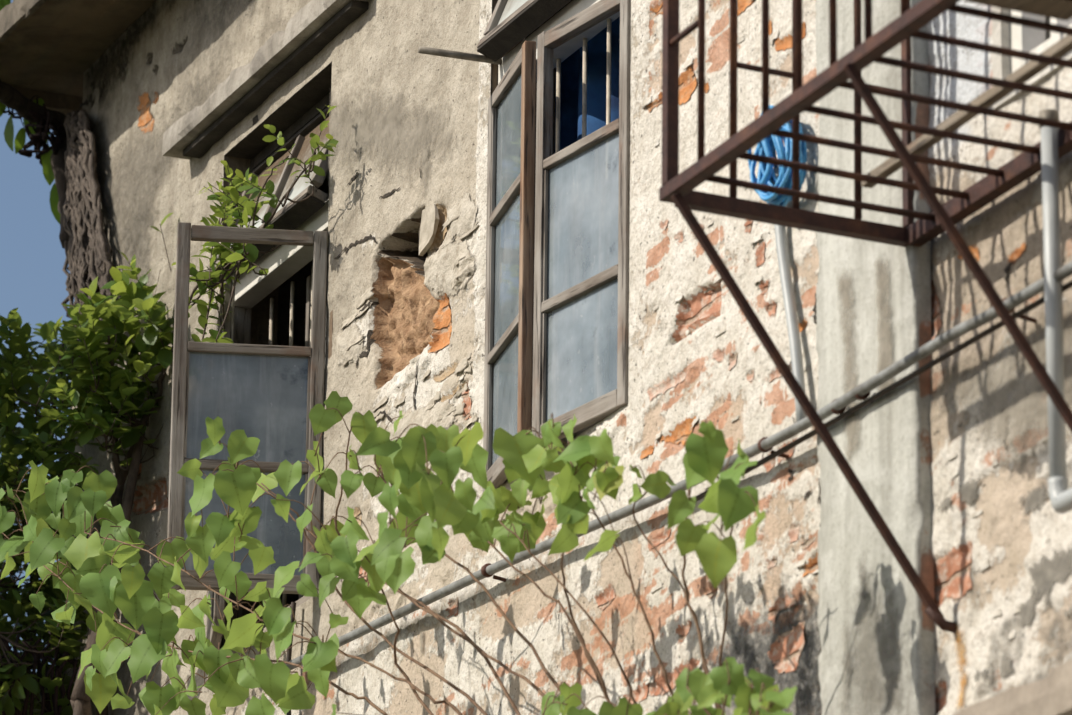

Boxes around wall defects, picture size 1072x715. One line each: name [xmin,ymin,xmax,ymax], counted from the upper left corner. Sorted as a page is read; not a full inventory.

spalling [679,56,709,106]
crack [335,234,377,259]
spalling [744,220,777,316]
crack [353,301,380,368]
spalling [340,203,479,429]
spalling [672,275,738,370]
damp [838,276,859,456]
damp [875,260,893,391]
spalling [640,414,699,459]
spalling [756,438,797,473]
spalling [933,541,990,608]
spalling [767,621,805,673]